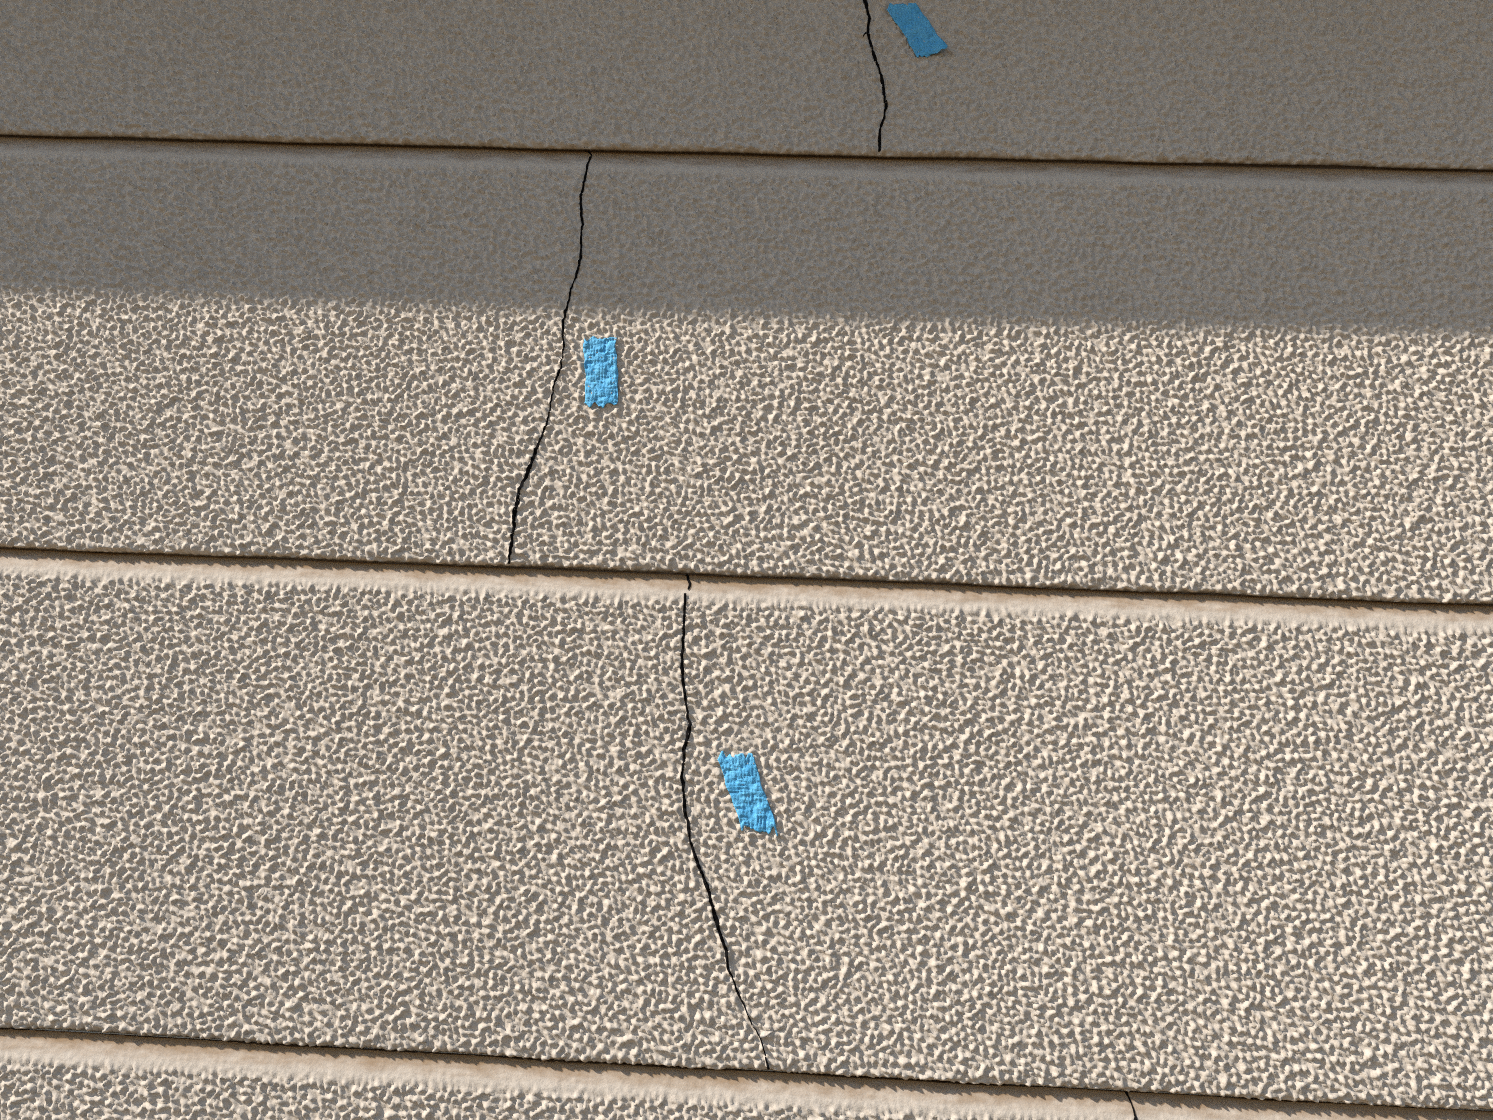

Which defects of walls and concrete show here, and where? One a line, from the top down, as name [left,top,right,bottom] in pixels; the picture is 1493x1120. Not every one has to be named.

crack [862,0,888,152]
crack [508,147,592,564]
crack [680,574,779,1070]
crack [1125,1092,1138,1120]